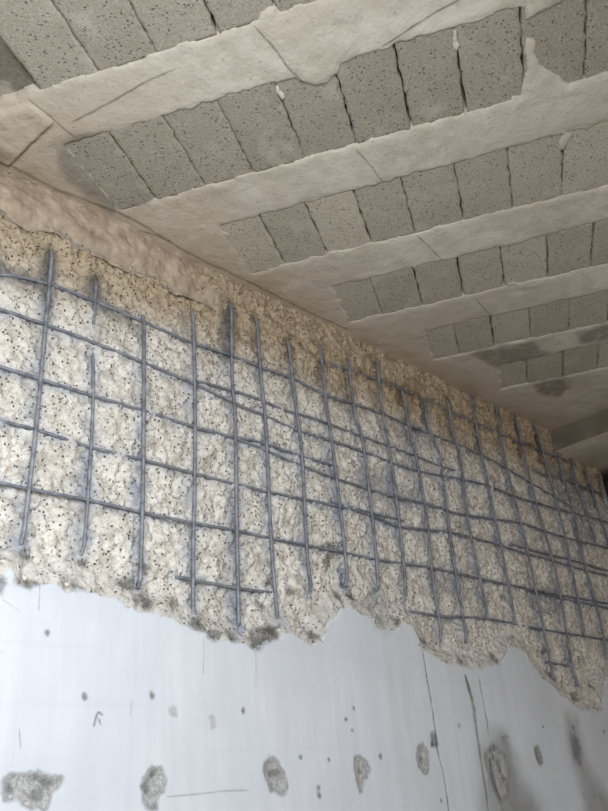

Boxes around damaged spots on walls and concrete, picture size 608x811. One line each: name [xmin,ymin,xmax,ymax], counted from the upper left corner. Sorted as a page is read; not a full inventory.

spalling [0,208,608,712]
spalling [2,771,62,811]
spalling [142,767,166,809]
spalling [264,757,288,794]
spalling [354,755,370,792]
spalling [416,743,433,774]
crack [422,649,449,811]
crack [466,678,501,801]